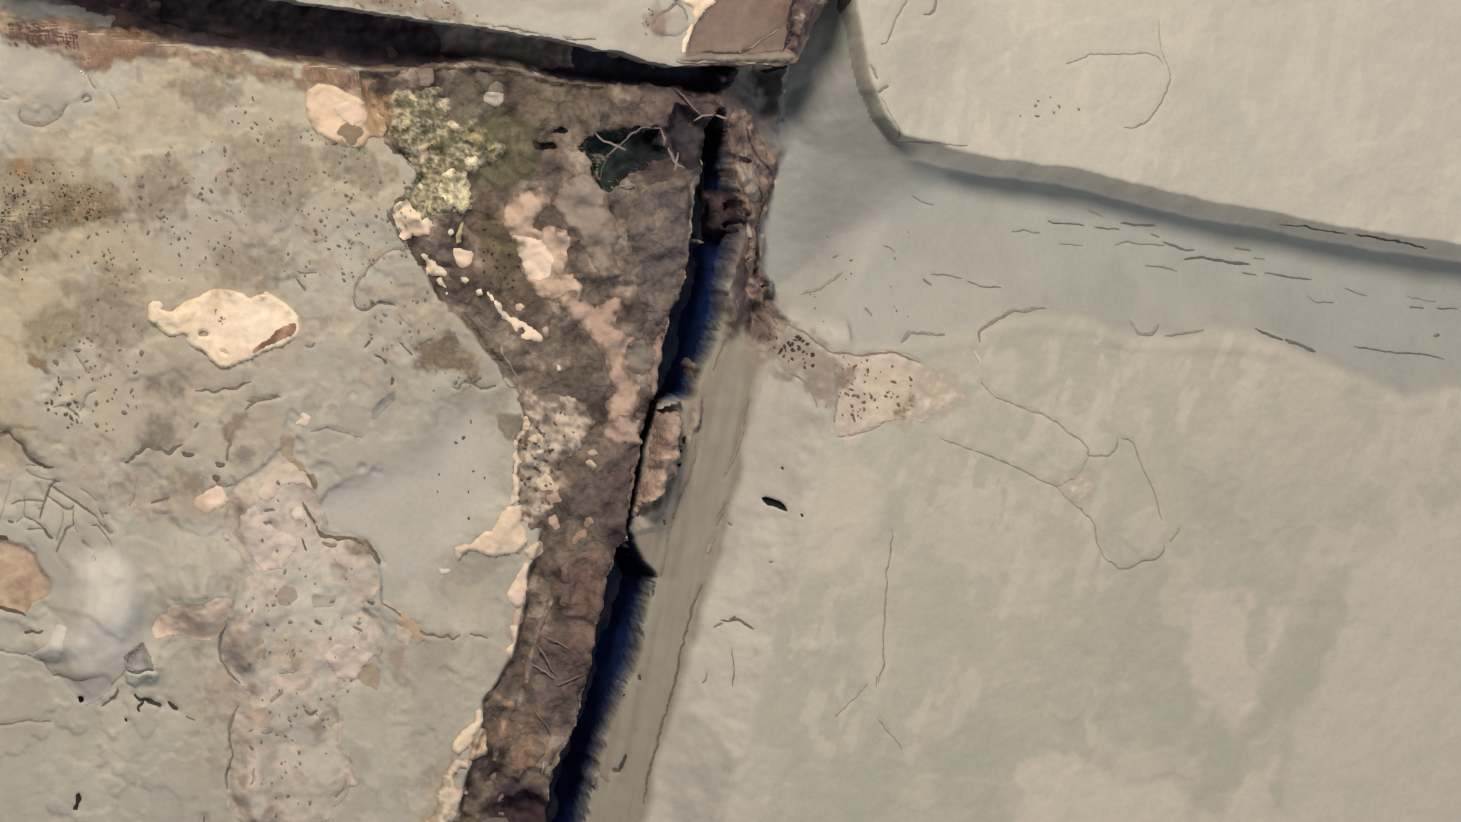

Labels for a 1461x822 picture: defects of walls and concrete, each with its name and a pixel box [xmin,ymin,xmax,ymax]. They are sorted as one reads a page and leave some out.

flaking render [642,0,851,82]
water stain [0,76,388,431]
crack [1012,211,1367,303]
crack [1284,225,1427,249]
peeling [147,289,315,368]
peeling [831,349,968,437]
spalling [305,62,778,822]
crack [0,428,113,568]
crack [591,196,1180,804]
flaking render [0,535,52,616]
flaking render [59,381,384,822]
crack [134,694,195,720]